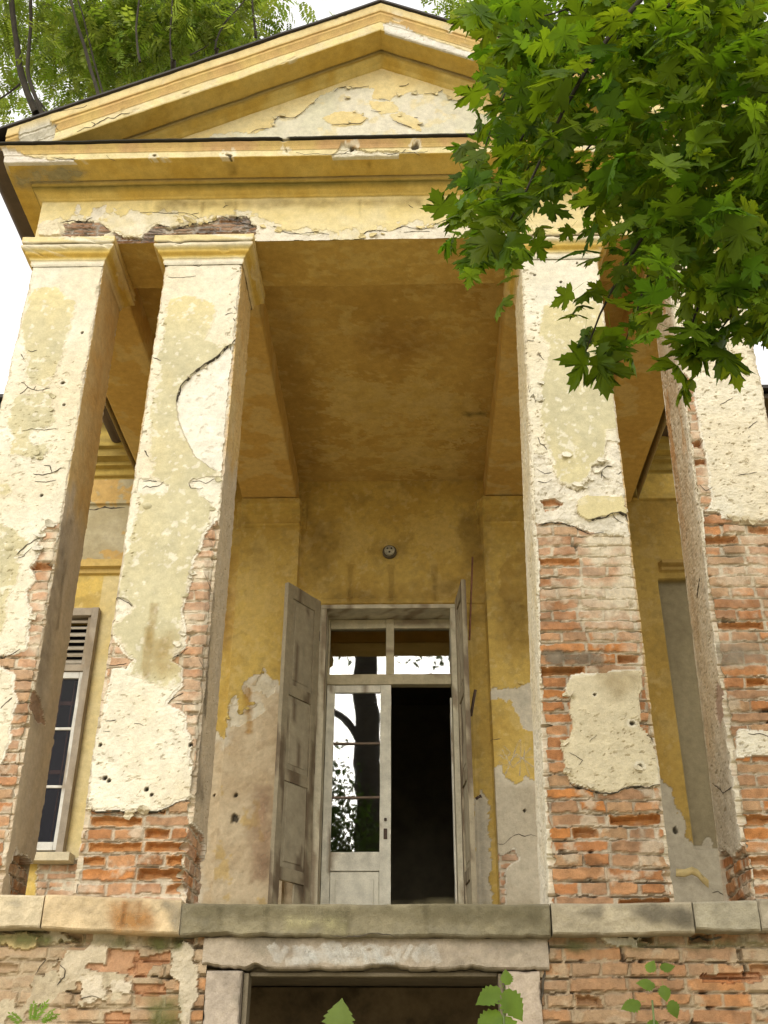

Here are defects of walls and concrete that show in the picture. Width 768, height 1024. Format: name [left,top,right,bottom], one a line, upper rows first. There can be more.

peeling [209,86,500,160]
peeling [42,204,470,244]
crack [177,307,236,401]
peeling [0,264,293,904]
spalling [474,258,768,905]
spalling [0,931,38,951]
spalling [59,941,199,1024]